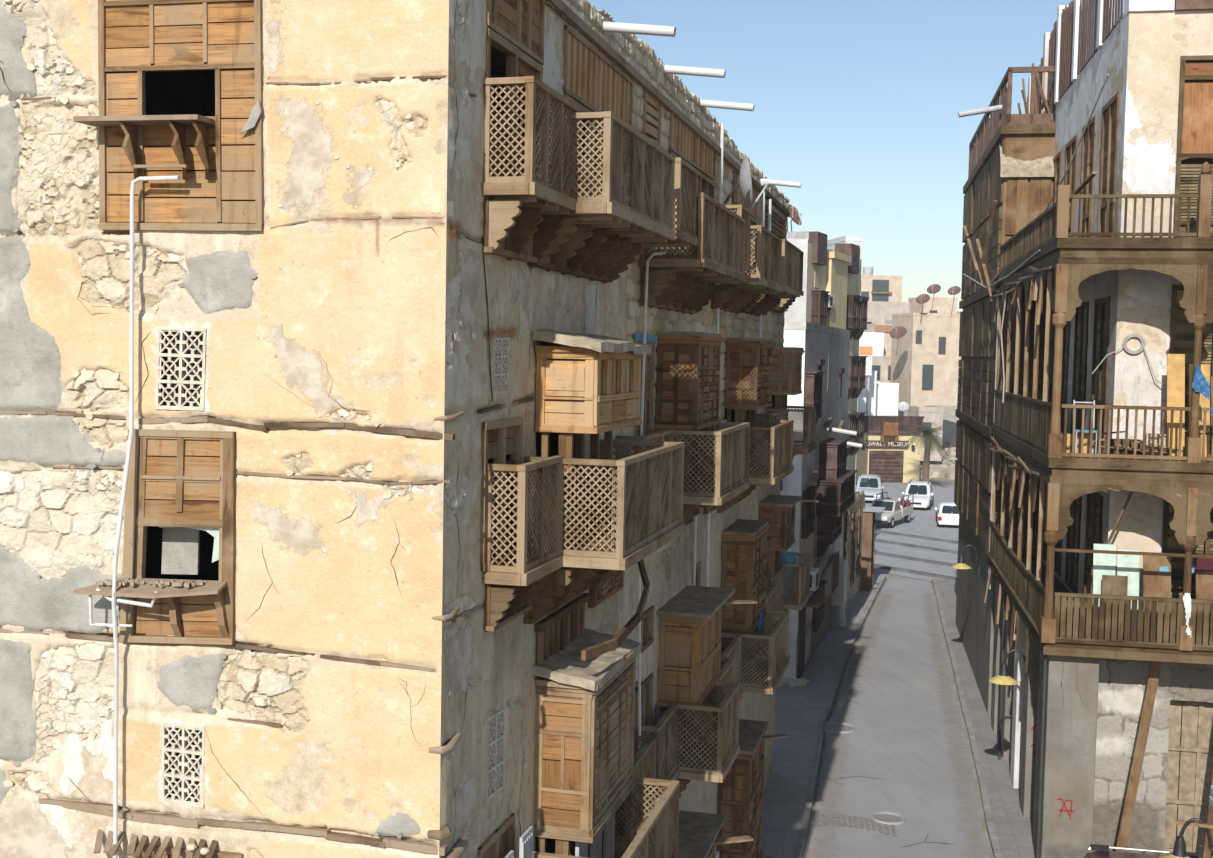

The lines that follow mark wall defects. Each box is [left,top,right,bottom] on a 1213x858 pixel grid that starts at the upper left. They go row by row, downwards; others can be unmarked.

spalling [0,0,189,314]
spalling [0,368,129,579]
spalling [0,633,122,858]
spalling [206,649,310,735]
peeling [1096,735,1134,756]
peeling [1098,684,1164,717]